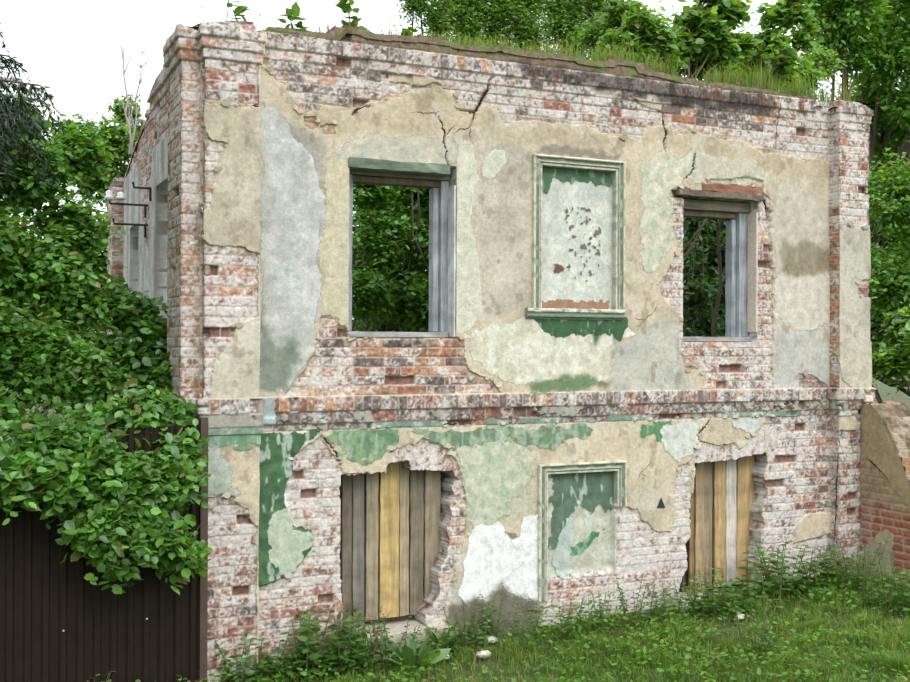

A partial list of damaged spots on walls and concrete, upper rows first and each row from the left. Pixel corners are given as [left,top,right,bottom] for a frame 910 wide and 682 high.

crack [413,83,490,163]
spalling [197,20,876,398]
leakage [767,177,828,275]
spalling [207,421,593,682]
spalling [536,415,861,627]